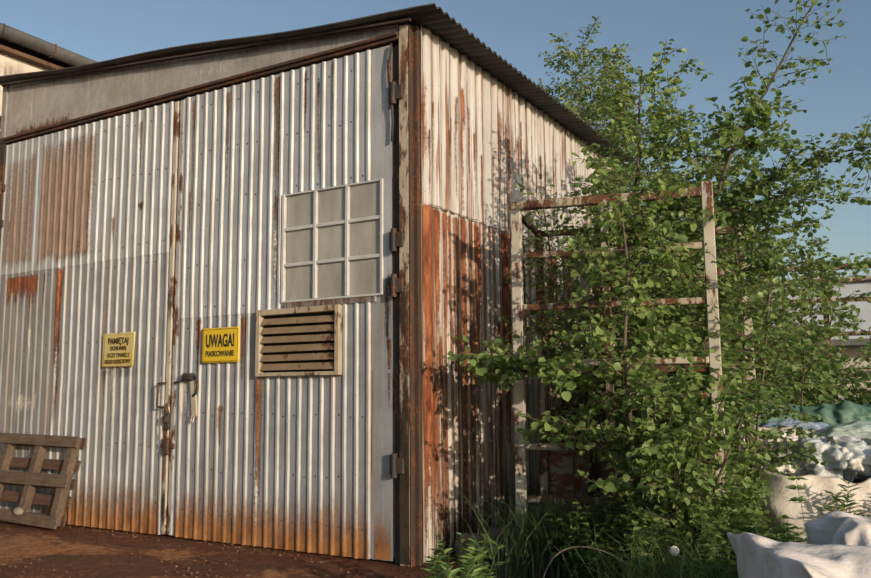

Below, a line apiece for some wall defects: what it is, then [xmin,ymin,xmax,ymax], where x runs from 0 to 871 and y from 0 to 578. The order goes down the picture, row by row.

corrosion [304,70,320,166]
corrosion [421,89,482,195]
corrosion [493,113,556,204]
corrosion [7,273,45,327]
corrosion [52,268,64,415]
corrosion [422,204,512,545]
corrosion [255,379,263,494]